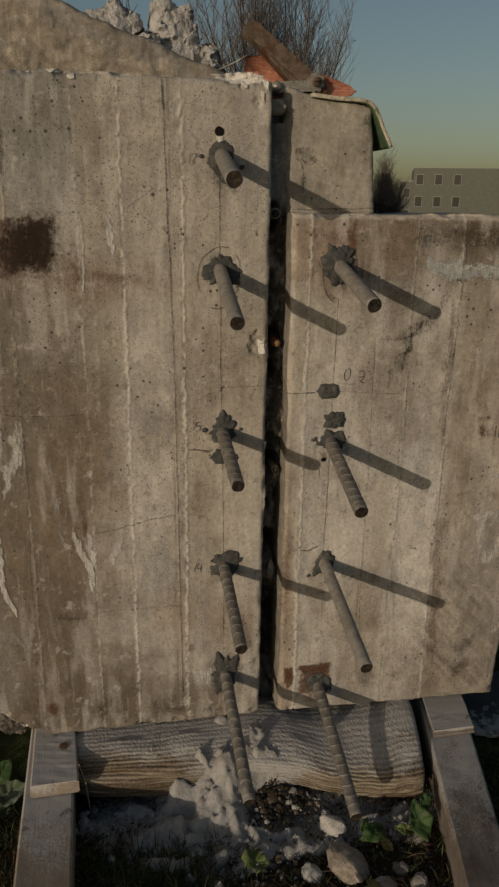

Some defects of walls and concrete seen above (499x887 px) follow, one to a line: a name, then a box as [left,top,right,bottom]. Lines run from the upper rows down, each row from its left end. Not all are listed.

peeling [427,256,499,283]
damp [0,426,22,494]
damp [0,539,17,617]
damp [72,524,96,592]
rust [284,663,330,694]